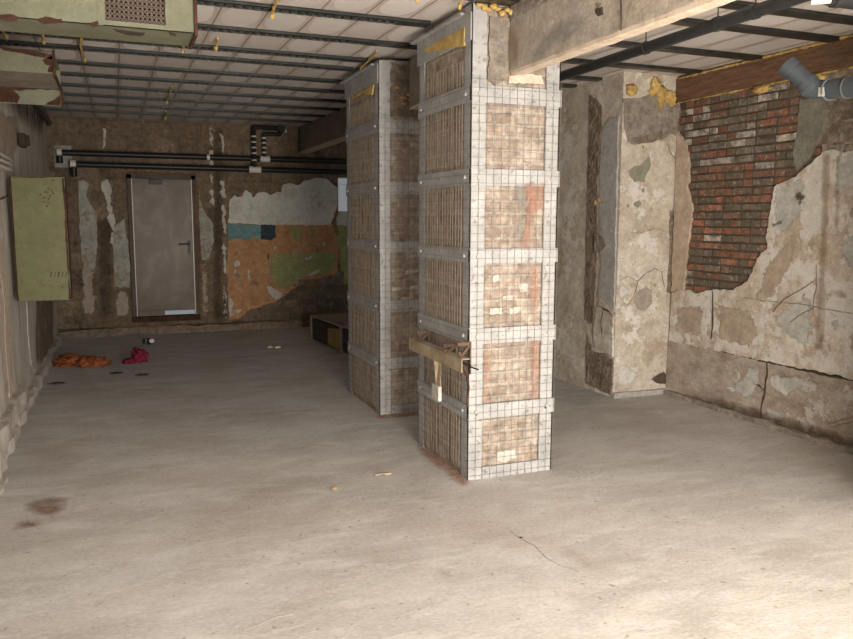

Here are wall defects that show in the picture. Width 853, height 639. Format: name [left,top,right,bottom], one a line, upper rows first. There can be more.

peeling [78,180,98,315]
peeling [113,218,130,316]
peeling [226,178,348,321]
peeling [619,82,853,398]
crack [710,291,853,413]